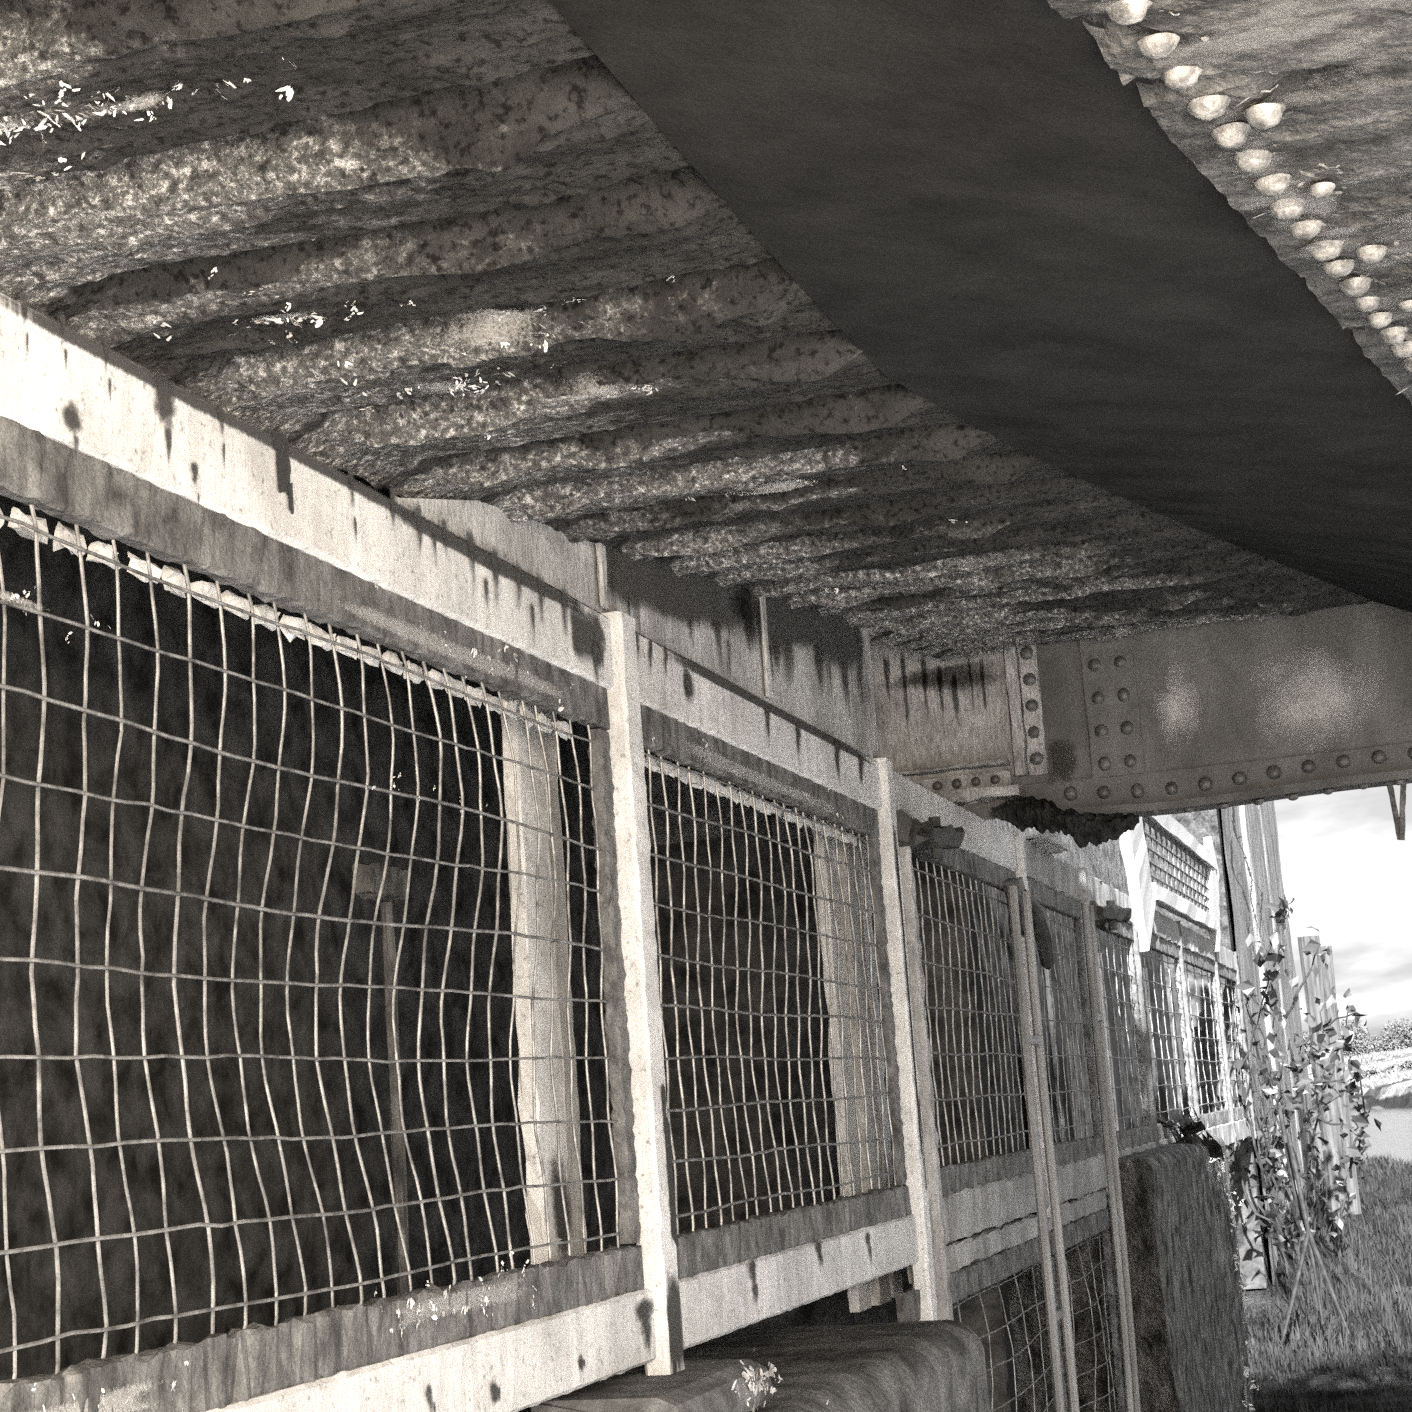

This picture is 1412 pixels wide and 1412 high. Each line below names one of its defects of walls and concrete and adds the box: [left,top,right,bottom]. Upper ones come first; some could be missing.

damp [0,295,530,575]